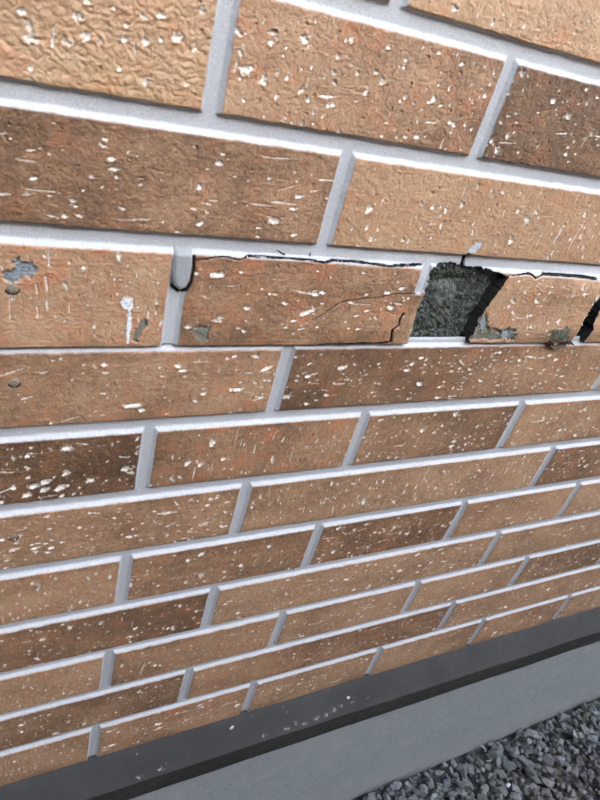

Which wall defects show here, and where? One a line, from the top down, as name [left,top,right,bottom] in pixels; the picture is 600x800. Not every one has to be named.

spalling [2,257,37,284]
crack [197,250,422,267]
crack [508,272,596,280]
spalling [410,262,518,342]
crack [318,313,403,345]
peeling [545,325,574,349]